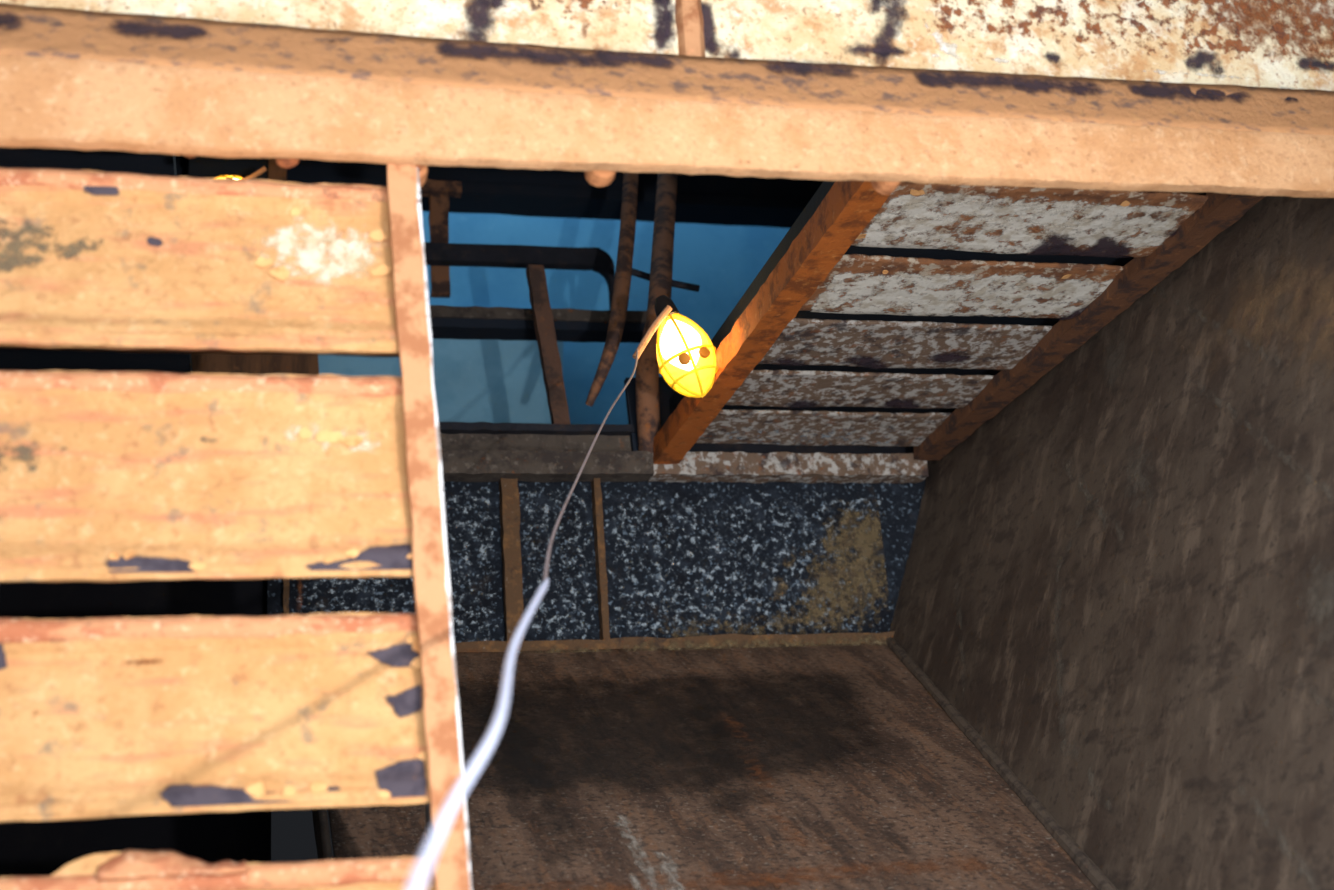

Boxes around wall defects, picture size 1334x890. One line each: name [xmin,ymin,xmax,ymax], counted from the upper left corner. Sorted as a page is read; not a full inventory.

corrosion [437,0,674,67]
corrosion [701,3,739,58]
corrosion [766,0,906,76]
corrosion [915,0,1334,102]
peeling [254,206,392,283]
damp [606,488,881,635]
damp [458,675,873,830]